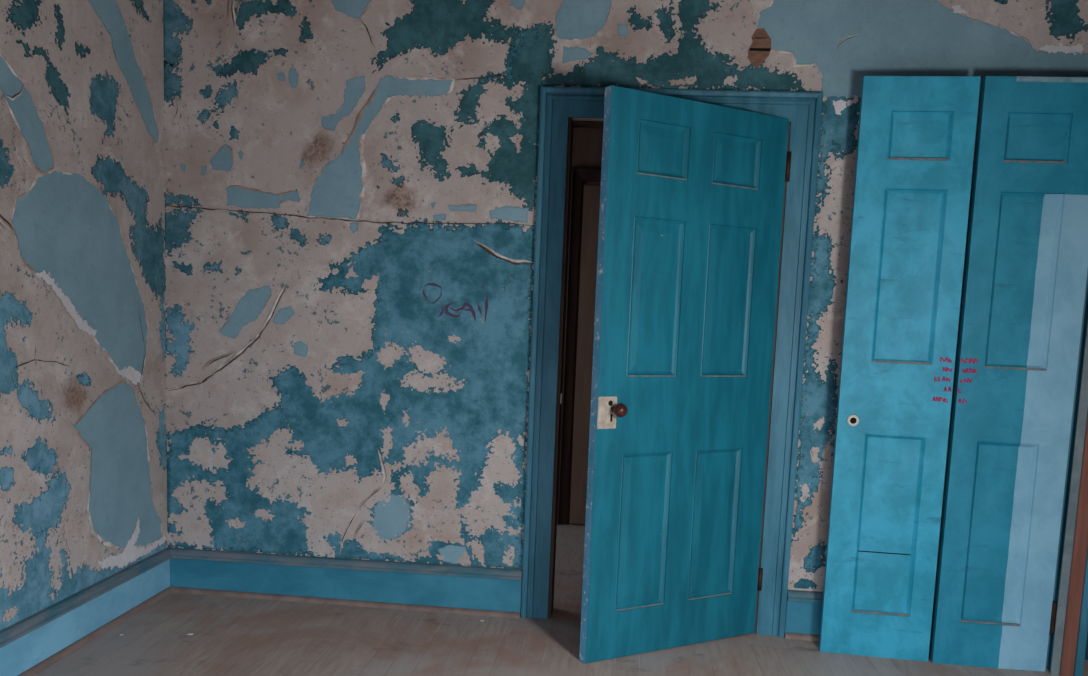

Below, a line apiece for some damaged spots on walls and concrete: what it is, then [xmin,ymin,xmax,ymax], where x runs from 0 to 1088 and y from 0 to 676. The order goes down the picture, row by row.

crack [0,215,14,234]
crack [165,205,533,265]
crack [138,284,286,415]
peeling [0,0,805,631]
peeling [791,217,839,546]
peeling [792,541,827,589]